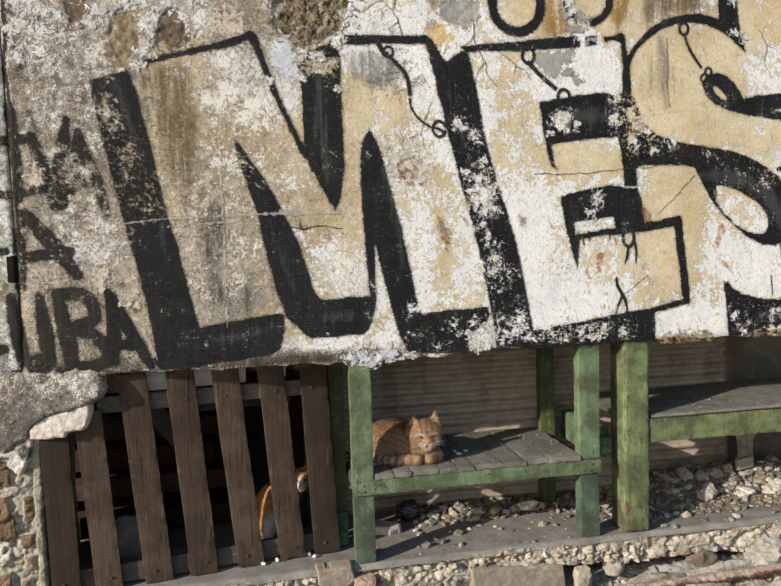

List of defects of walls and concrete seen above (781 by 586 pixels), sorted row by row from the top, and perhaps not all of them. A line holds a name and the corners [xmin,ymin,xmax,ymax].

spalling [1,0,245,73]
spalling [256,0,365,90]
spalling [420,0,481,59]
peeling [534,47,585,85]
peeling [558,0,590,37]